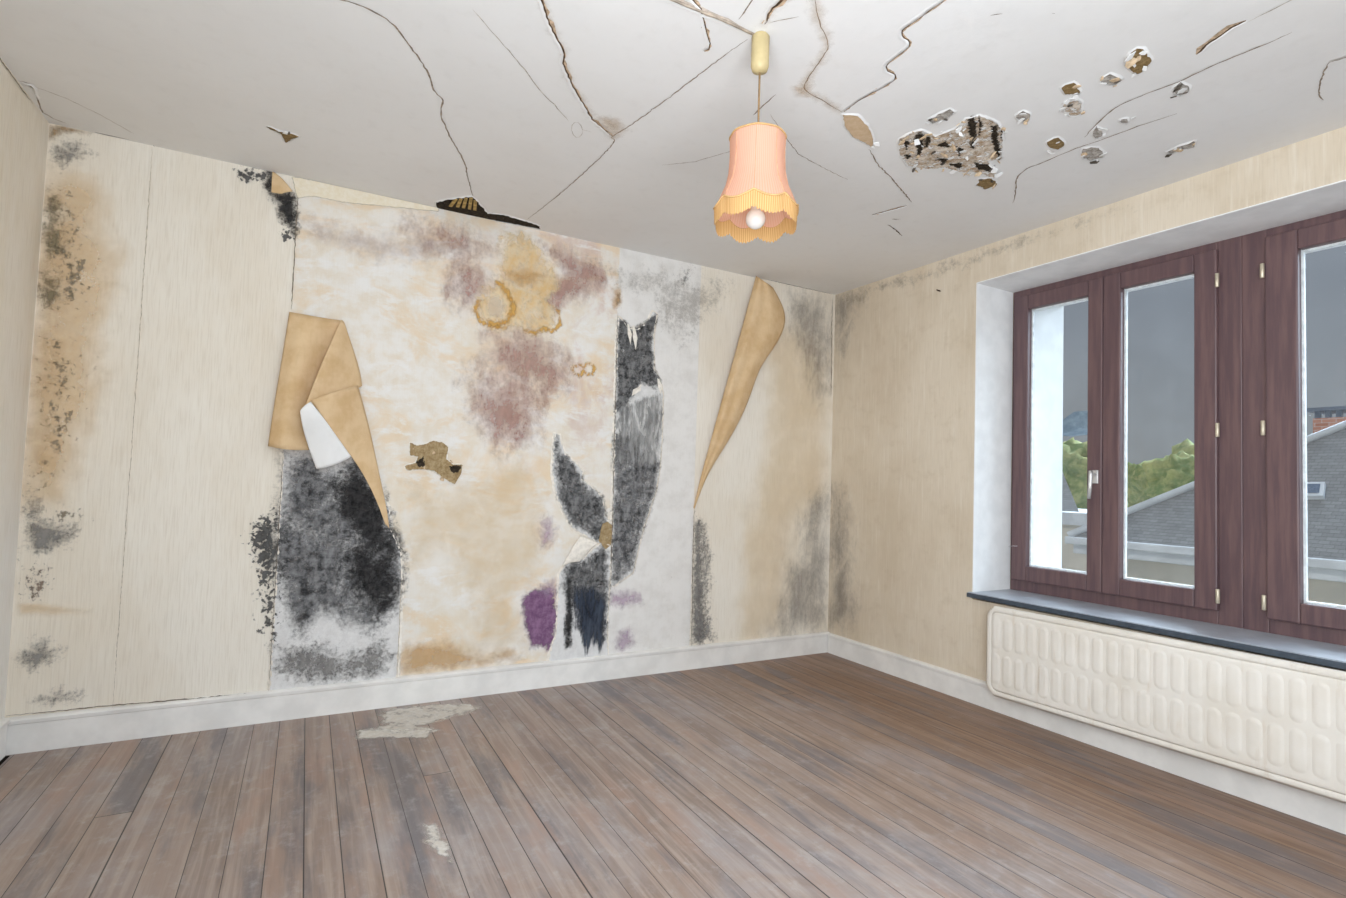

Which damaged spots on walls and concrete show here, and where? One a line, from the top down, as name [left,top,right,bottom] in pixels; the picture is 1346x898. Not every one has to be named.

crack [341,0,473,195]
crack [473,0,946,219]
flaking render [896,107,1033,190]
flaking render [1099,46,1155,87]
crack [1013,0,1292,202]
crack [1318,55,1346,100]
water stain [234,168,298,242]
flaking render [434,195,541,230]
water stain [461,232,604,403]
flaking render [404,440,463,485]
water stain [20,509,81,599]
water stain [521,589,557,650]